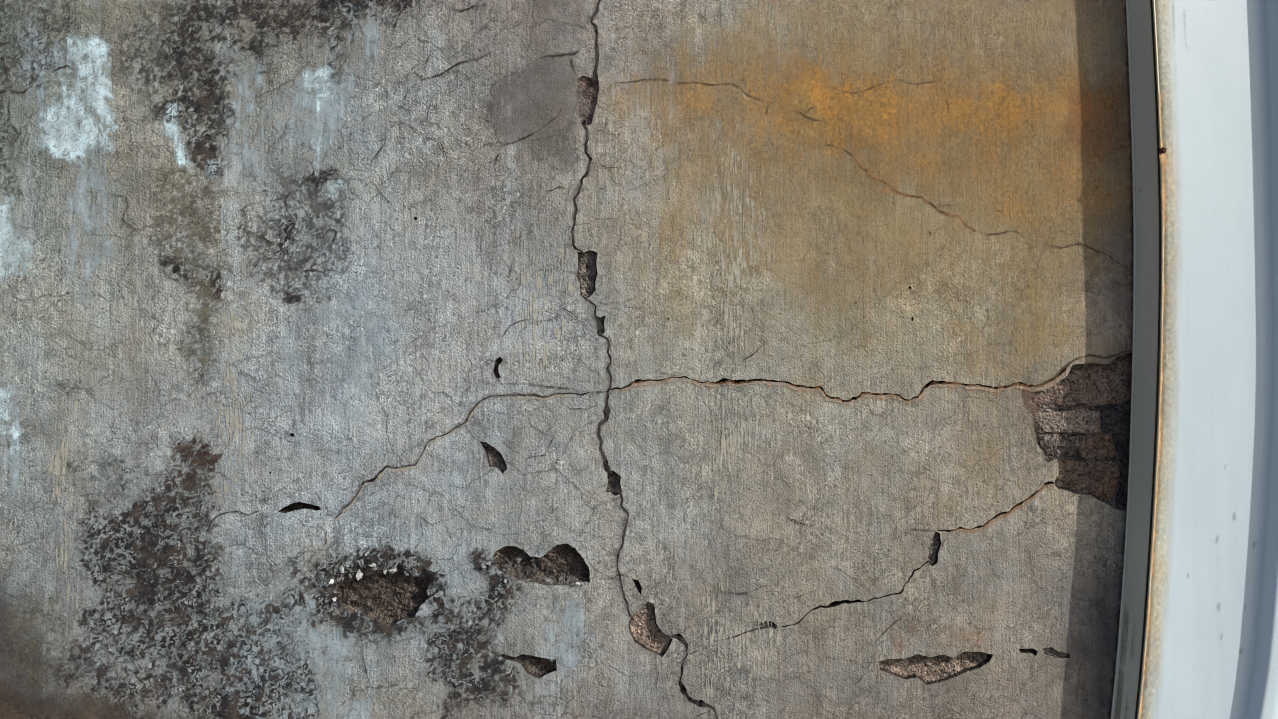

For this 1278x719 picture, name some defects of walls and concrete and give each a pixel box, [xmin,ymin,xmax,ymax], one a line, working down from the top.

crack [371,55,484,205]
crack [495,0,1113,259]
crack [254,194,337,276]
spalling [577,251,598,299]
water stain [0,0,534,719]
crack [326,257,1129,620]
spalling [1027,352,1132,511]
spalling [320,551,435,627]
spalling [482,543,590,678]
spalling [629,579,672,657]
crack [656,481,1054,719]
spalling [879,651,993,685]